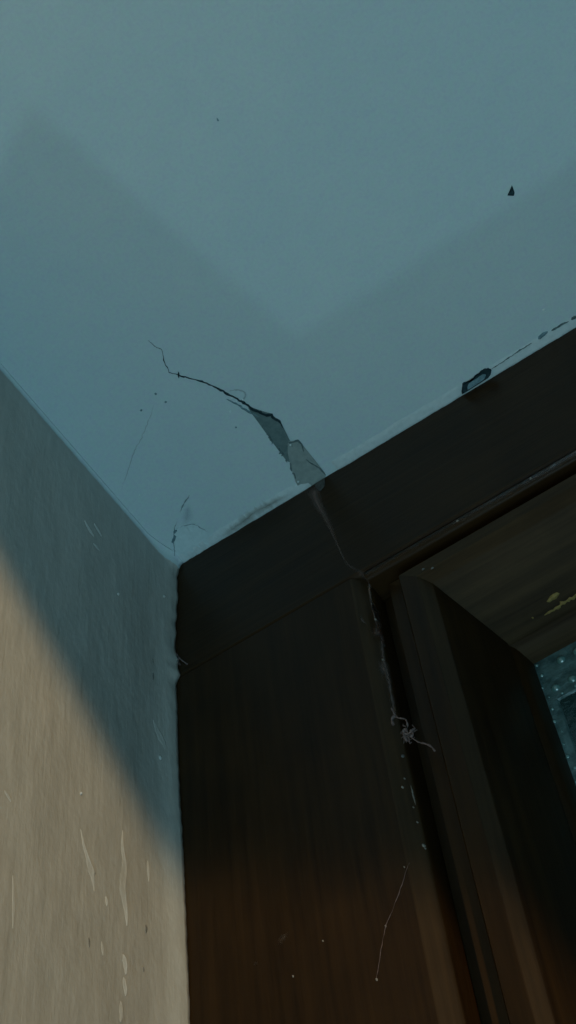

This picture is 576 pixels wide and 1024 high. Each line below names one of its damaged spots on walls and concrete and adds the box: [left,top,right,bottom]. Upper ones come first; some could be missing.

crack [148,340,326,486]
spalling [461,368,492,394]